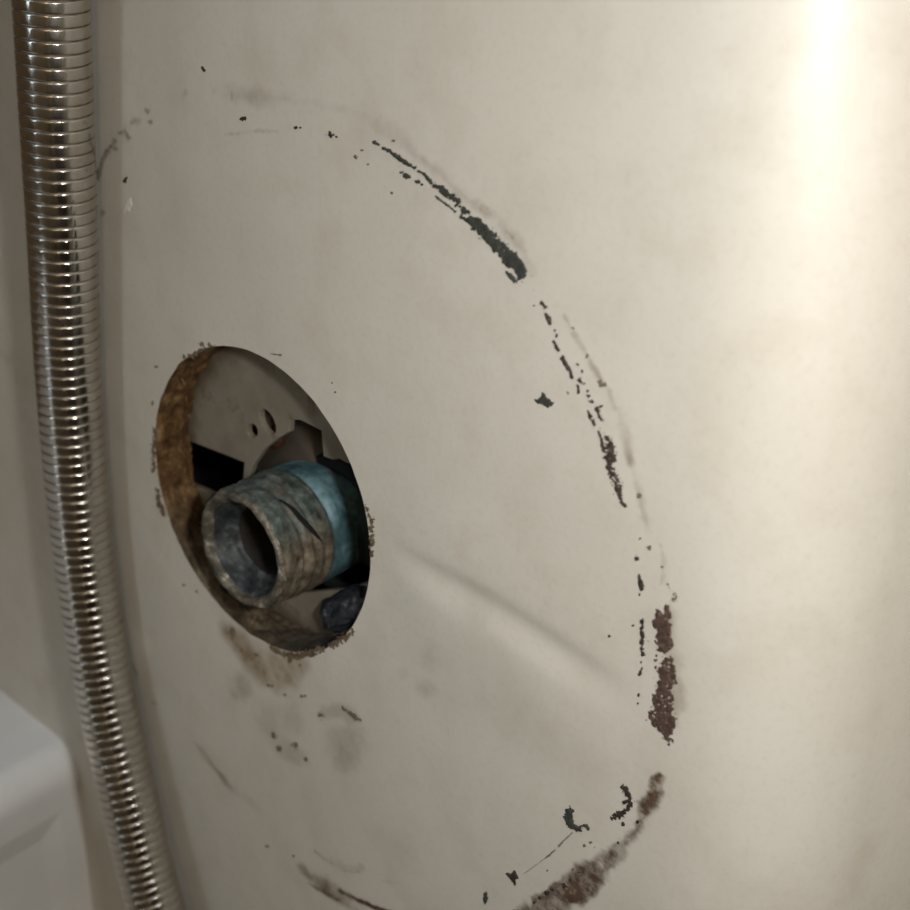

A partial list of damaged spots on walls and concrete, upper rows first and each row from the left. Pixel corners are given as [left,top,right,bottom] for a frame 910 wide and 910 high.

peeling [372,140,527,283]
peeling [534,392,554,408]
peeling [540,300,627,508]
peeling [563,805,590,832]
peeling [610,784,635,826]
rust [632,773,662,835]
rust [315,882,386,910]
rust [522,850,617,910]